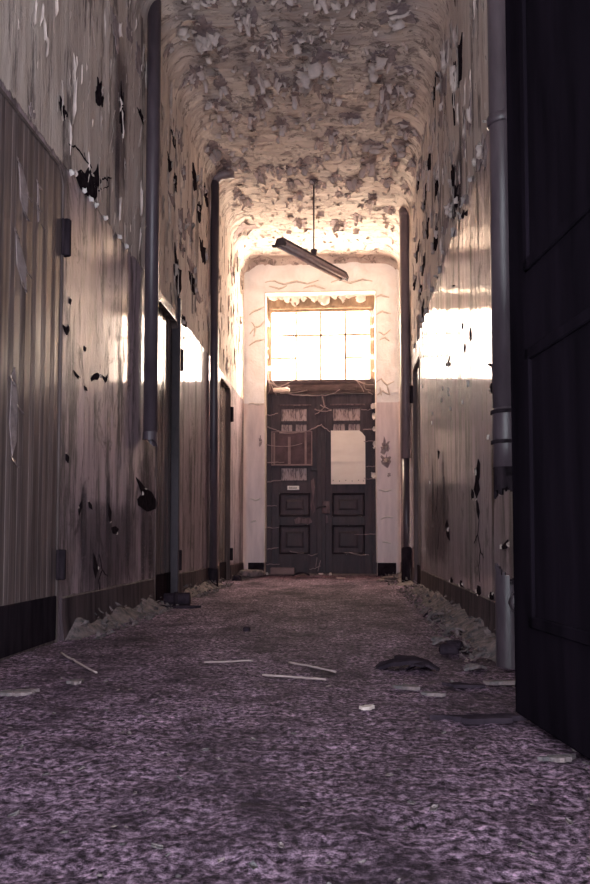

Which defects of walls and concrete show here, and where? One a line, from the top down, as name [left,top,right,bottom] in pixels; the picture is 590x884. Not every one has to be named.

peeling [33,0,59,69]
peeling [57,0,147,155]
peeling [161,0,487,375]
spalling [136,477,158,512]
spalling [471,459,480,519]